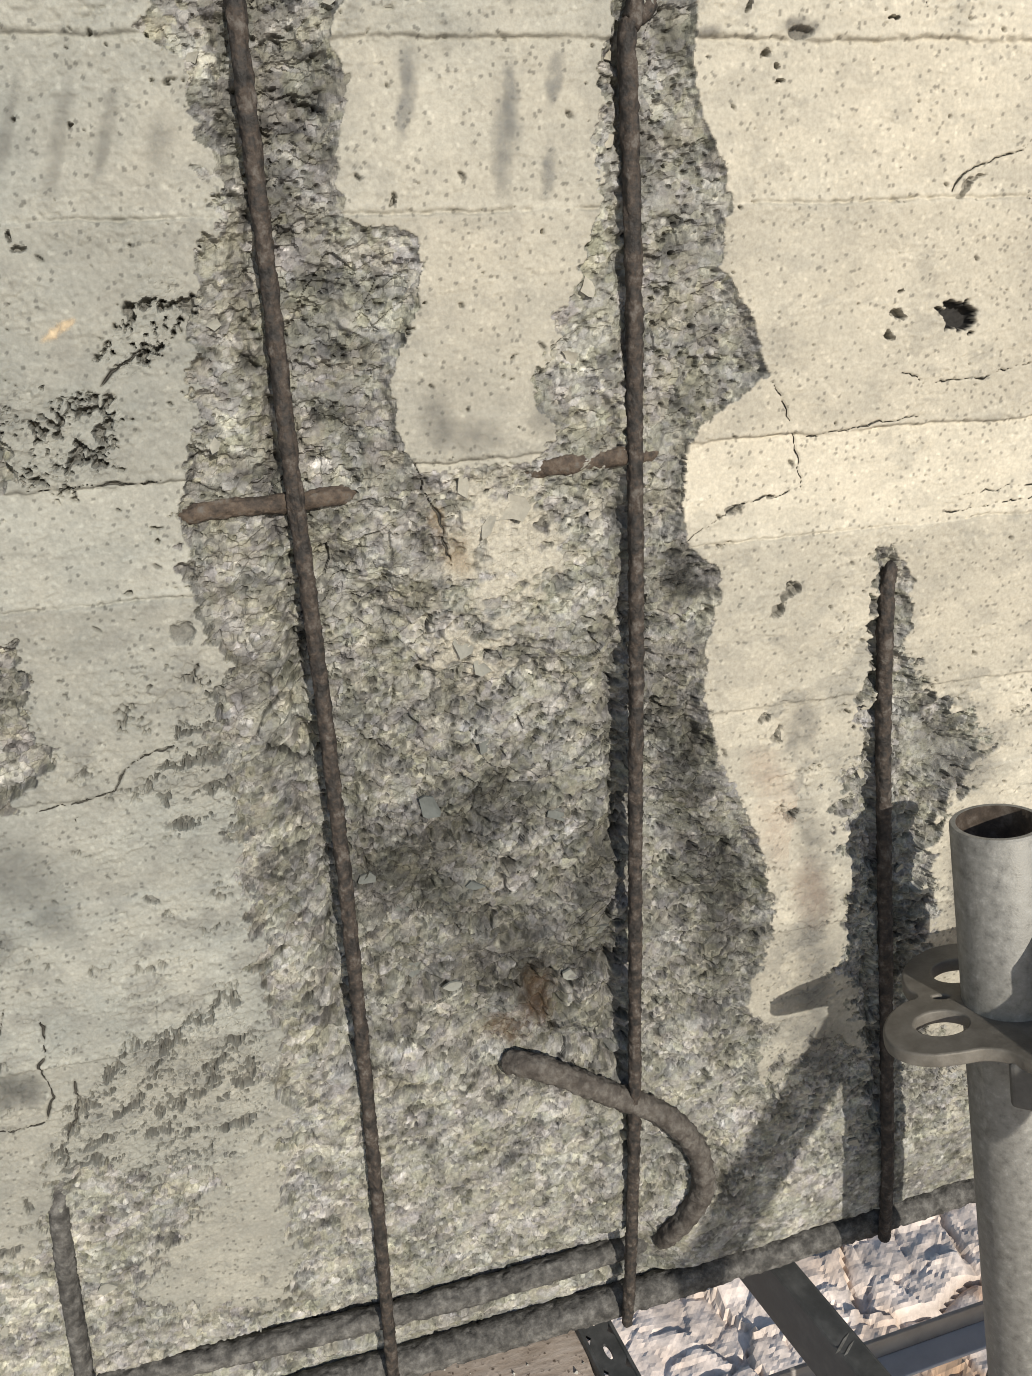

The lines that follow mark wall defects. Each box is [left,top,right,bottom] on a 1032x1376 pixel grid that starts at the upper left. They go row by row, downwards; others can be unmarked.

crack [952,141,1031,192]
crack [902,362,1030,383]
crack [681,385,918,544]
crack [944,484,1032,513]
spalling [0,0,658,1376]
spalling [501,0,999,1313]
crack [0,1020,79,1167]